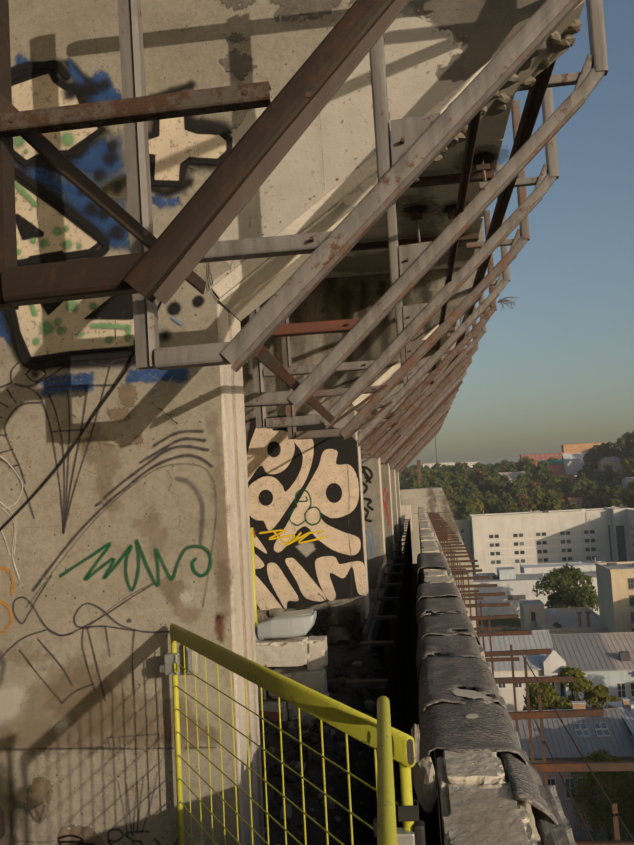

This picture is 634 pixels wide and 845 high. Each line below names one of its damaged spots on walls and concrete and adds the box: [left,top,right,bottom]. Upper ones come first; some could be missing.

spalling [220,0,256,11]
spalling [271,0,342,26]
spalling [219,32,257,81]
spalling [481,19,582,116]
spalling [433,125,468,162]
peeling [25,777,53,823]
spalling [413,756,438,813]
peeling [55,824,104,845]